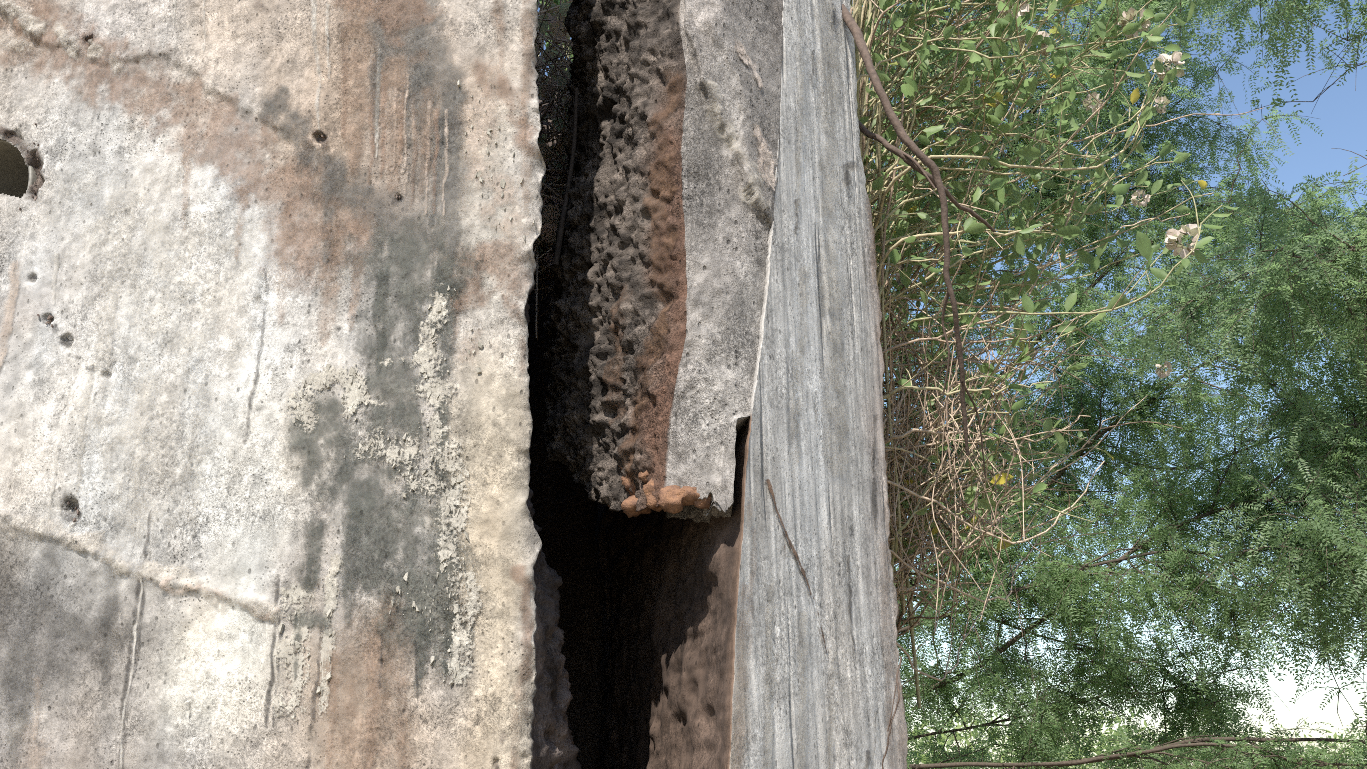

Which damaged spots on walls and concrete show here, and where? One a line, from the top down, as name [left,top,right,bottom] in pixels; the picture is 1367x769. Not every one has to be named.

spalling [0,126,45,211]
water stain [260,0,468,693]
crack [118,510,151,769]